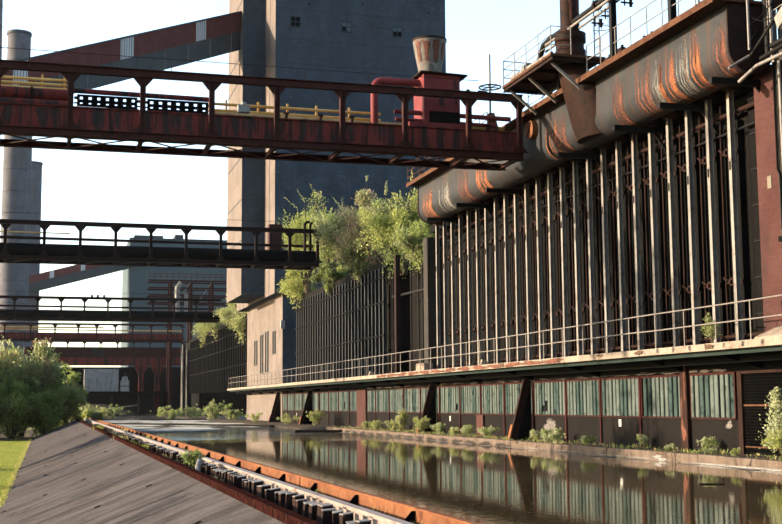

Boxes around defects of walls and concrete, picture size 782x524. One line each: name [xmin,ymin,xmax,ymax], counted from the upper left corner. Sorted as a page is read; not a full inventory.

corrosion [416,40,445,63]
corrosion [613,29,752,126]
corrosion [459,170,495,204]
corrosion [423,193,447,218]